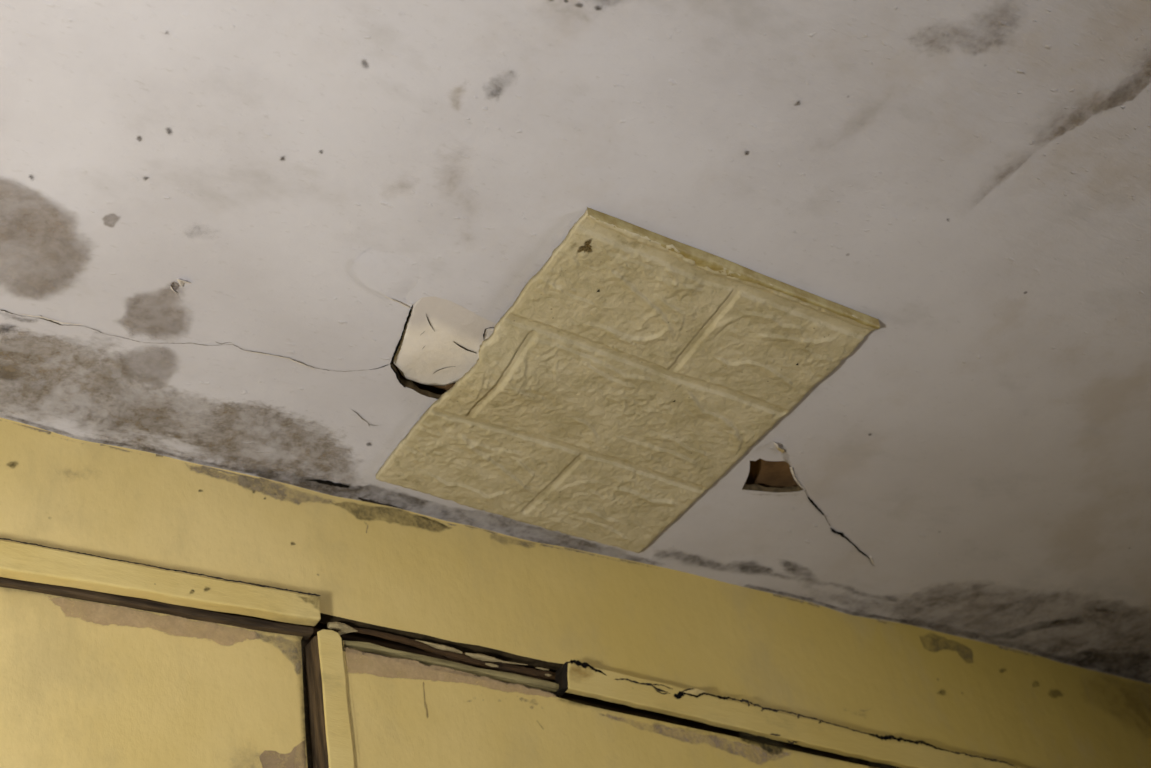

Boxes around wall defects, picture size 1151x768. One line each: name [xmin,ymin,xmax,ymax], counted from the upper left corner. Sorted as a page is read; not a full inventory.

water stain [0,190,80,295]
crack [1,310,139,342]
crack [173,341,361,372]
flaking render [370,296,496,399]
crack [805,491,873,565]
peeling [51,598,301,673]
crack [570,659,1014,766]
peeling [260,741,306,768]